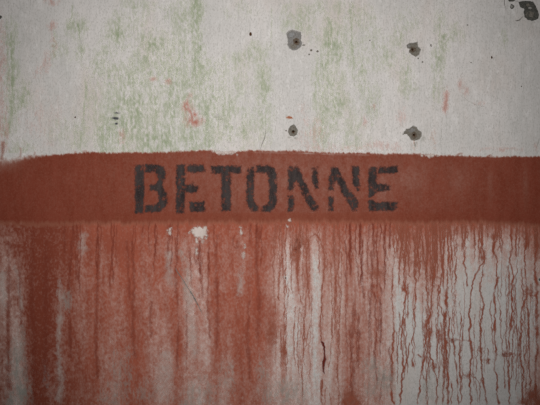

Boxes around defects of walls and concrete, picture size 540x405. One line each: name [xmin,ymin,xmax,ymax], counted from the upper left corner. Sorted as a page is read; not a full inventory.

spalling [508,0,539,21]
peeling [188,226,208,255]